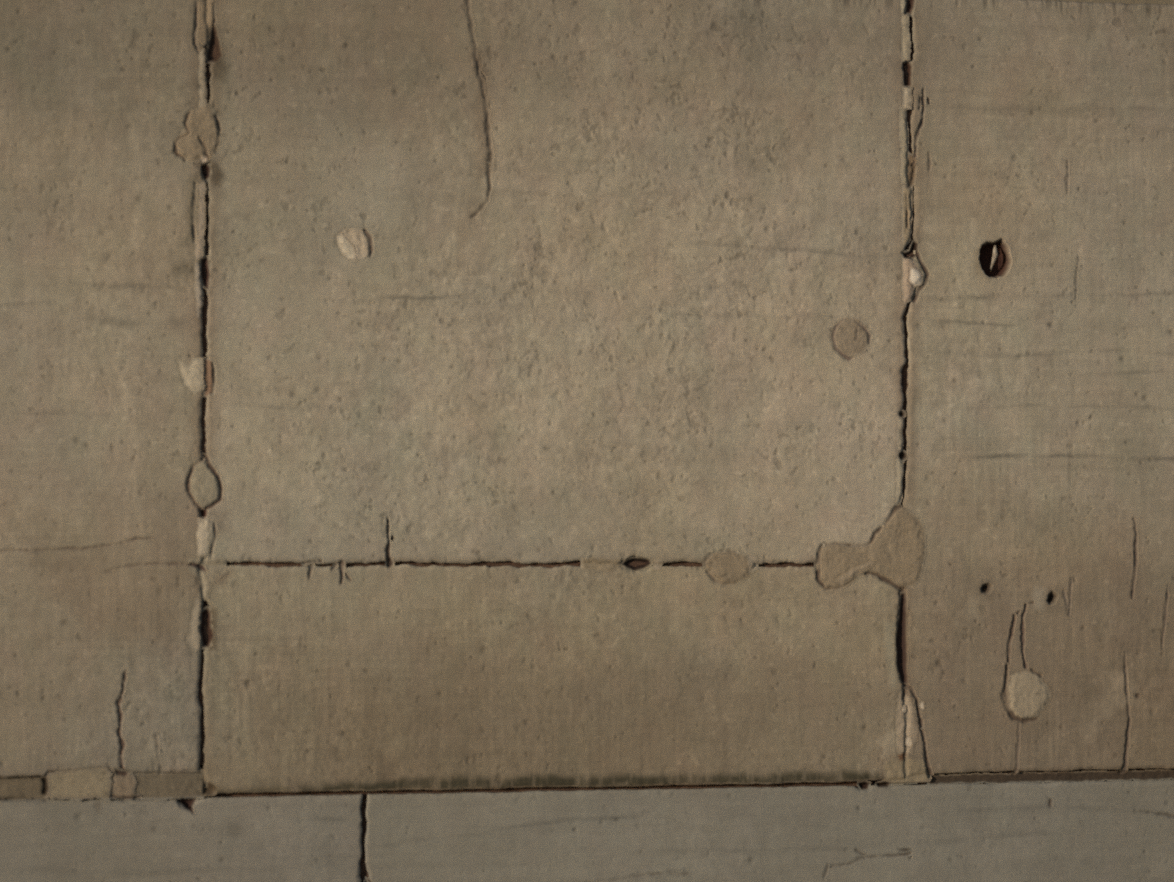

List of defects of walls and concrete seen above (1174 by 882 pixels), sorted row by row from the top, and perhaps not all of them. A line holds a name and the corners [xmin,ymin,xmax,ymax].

crack [192,0,218,55]
crack [172,109,224,245]
crack [464,0,495,220]
crack [905,87,934,229]
crack [301,558,353,585]
crack [902,684,934,778]
crack [1000,577,1074,777]